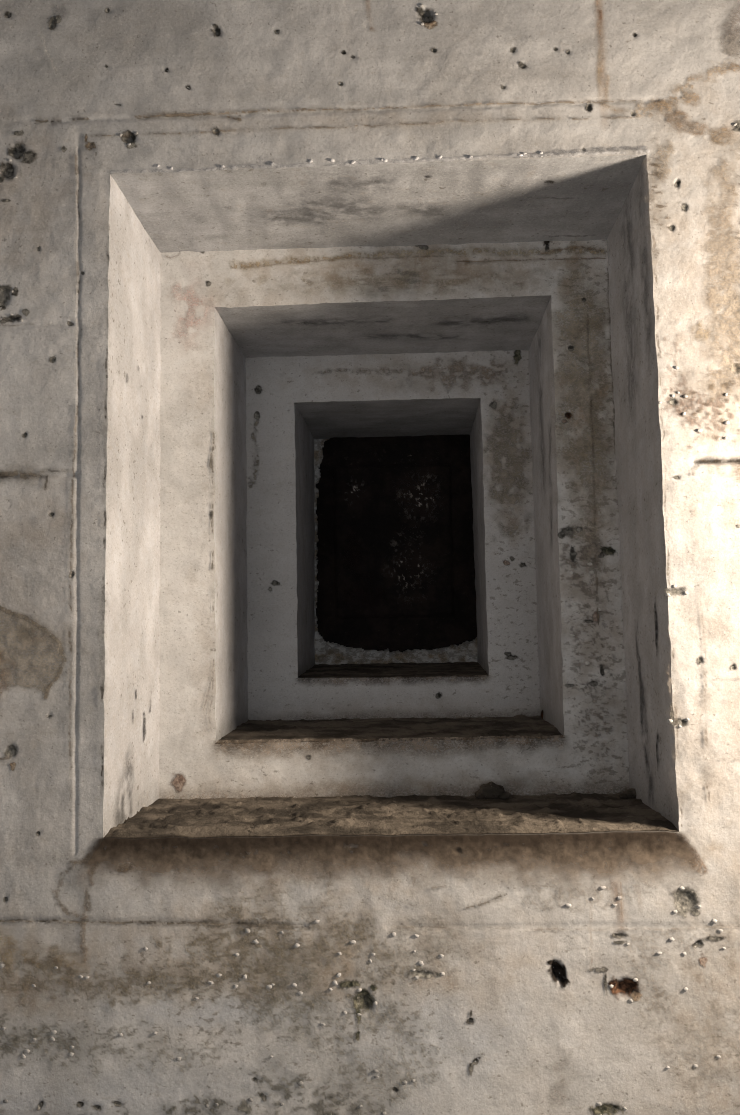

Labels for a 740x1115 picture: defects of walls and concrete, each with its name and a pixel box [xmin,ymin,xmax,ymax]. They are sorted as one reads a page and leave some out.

water stain [635,12,740,144]
water stain [696,161,740,422]
crack [692,459,740,475]
crack [663,496,671,585]
water stain [0,606,66,699]
crack [667,648,708,757]
spalling [548,960,570,987]